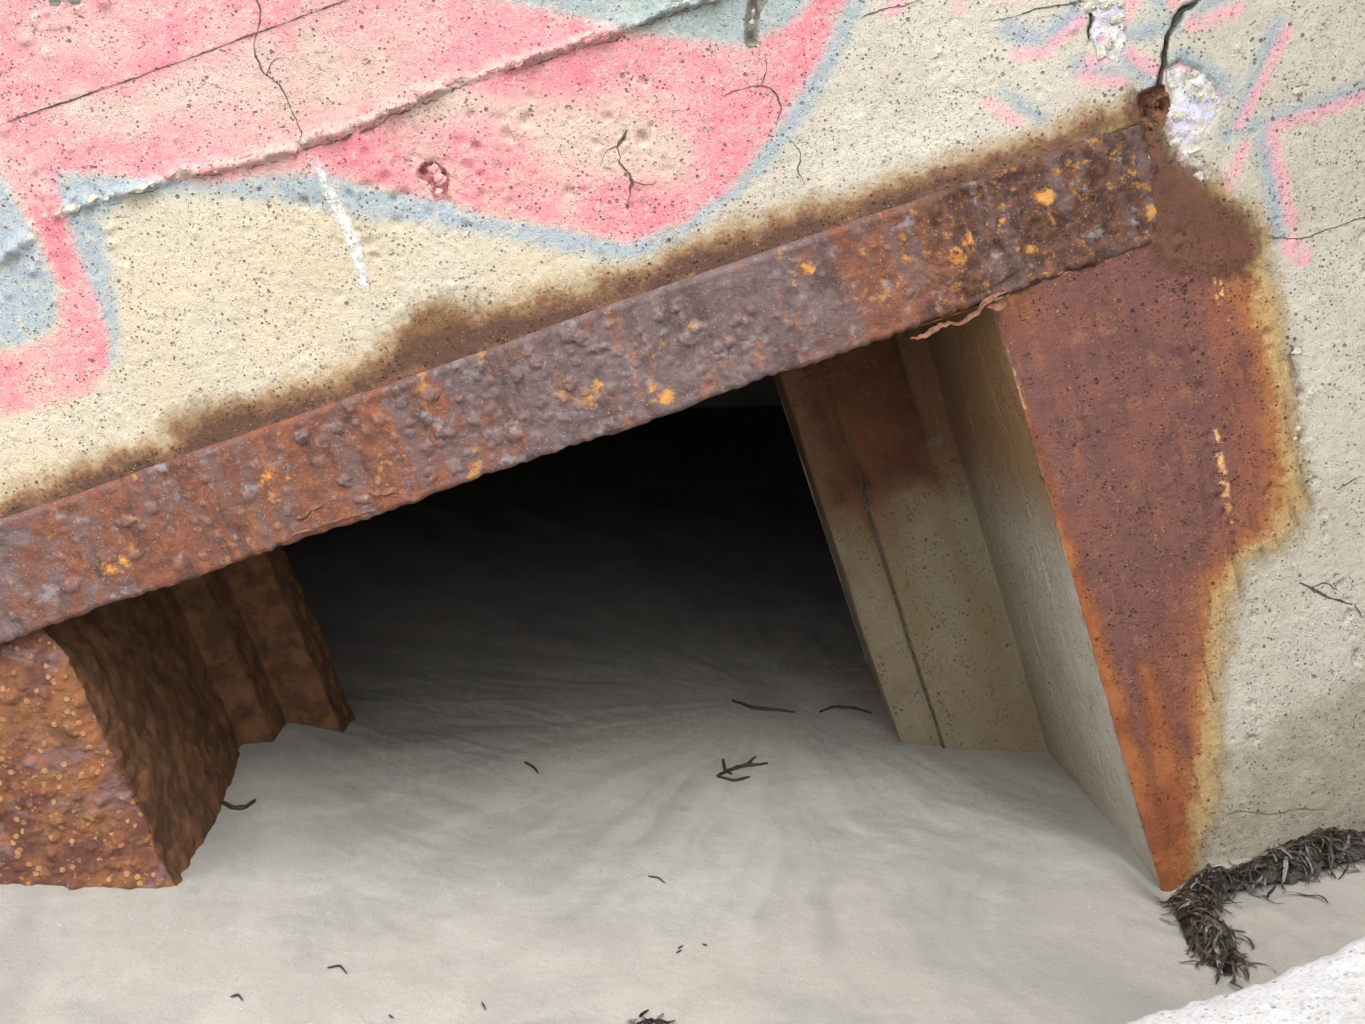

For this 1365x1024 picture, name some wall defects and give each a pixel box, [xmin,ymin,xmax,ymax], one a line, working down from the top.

crack [993,1,1104,41]
spalling [1077,0,1127,62]
crack [1157,0,1199,85]
crack [0,0,715,215]
crack [724,56,805,184]
spalling [1137,60,1222,181]
crack [1265,217,1365,239]
corrosion [0,90,1312,892]